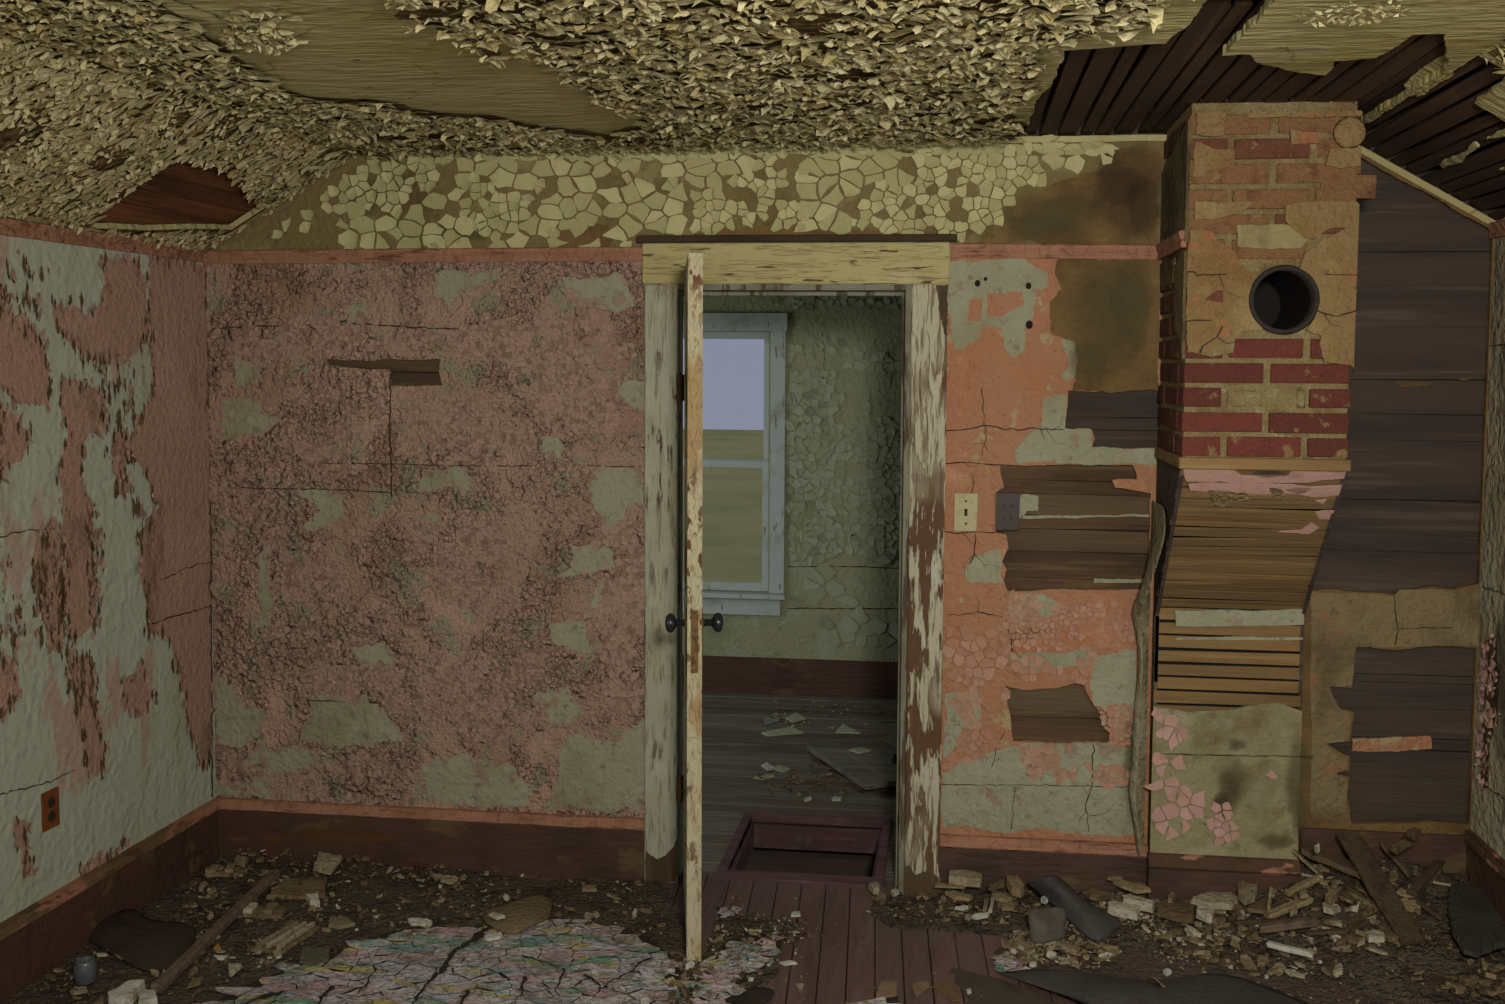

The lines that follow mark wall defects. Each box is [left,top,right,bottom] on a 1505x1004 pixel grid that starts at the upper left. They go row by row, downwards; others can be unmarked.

peeling [1293,0,1438,28]
peeling [1484,39,1505,74]
crack [1186,271,1242,354]
crack [1317,270,1366,328]
peeling [0,0,1171,818]
crack [788,563,899,571]
crack [787,604,899,612]
peeling [941,548,1239,846]
flaking render [1310,589,1501,821]
peeling [13,815,38,879]
peeling [79,835,131,875]